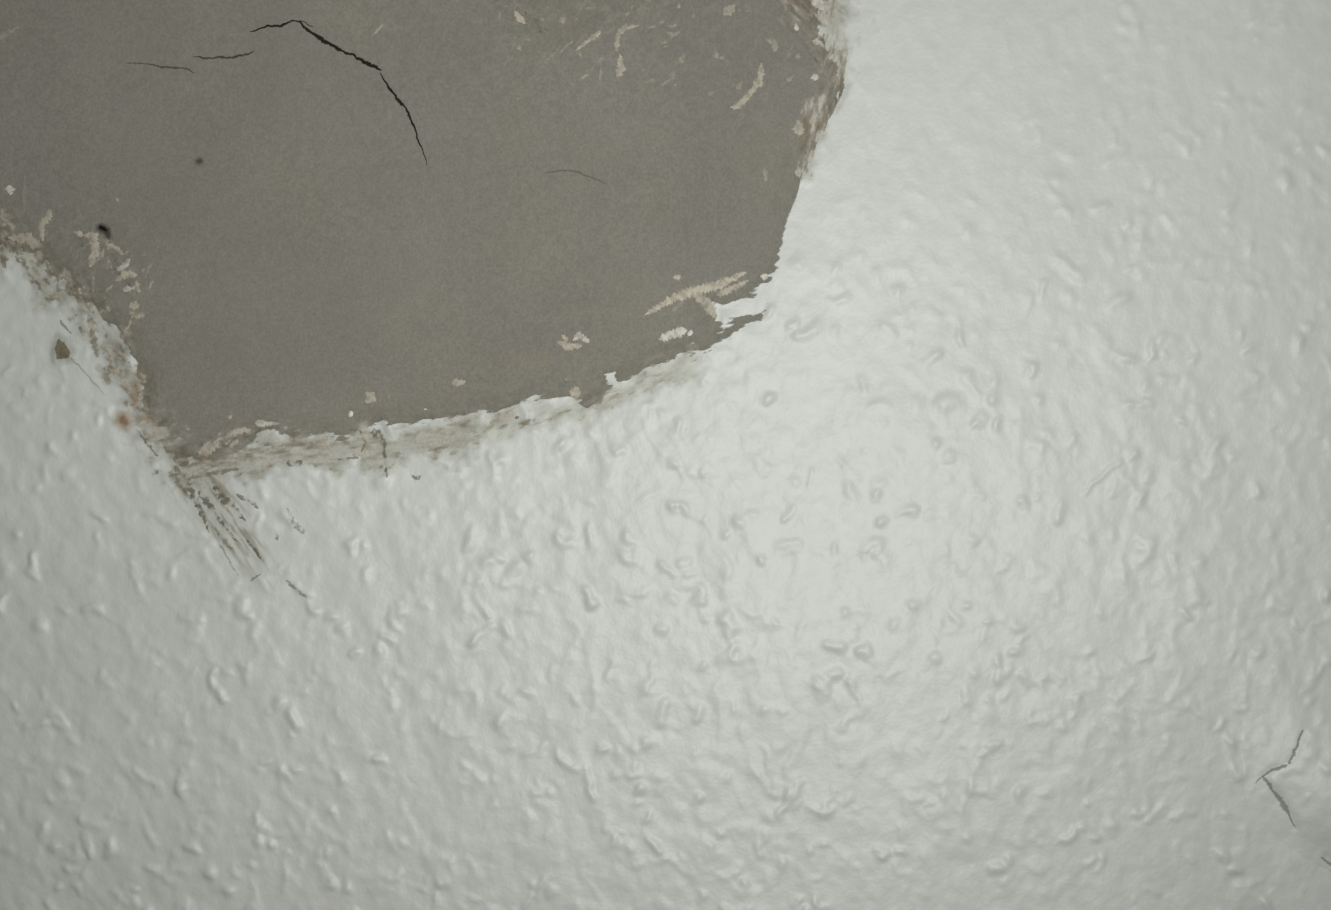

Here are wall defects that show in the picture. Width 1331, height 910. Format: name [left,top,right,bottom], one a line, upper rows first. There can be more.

crack [250,20,427,165]
flaking render [0,0,848,559]